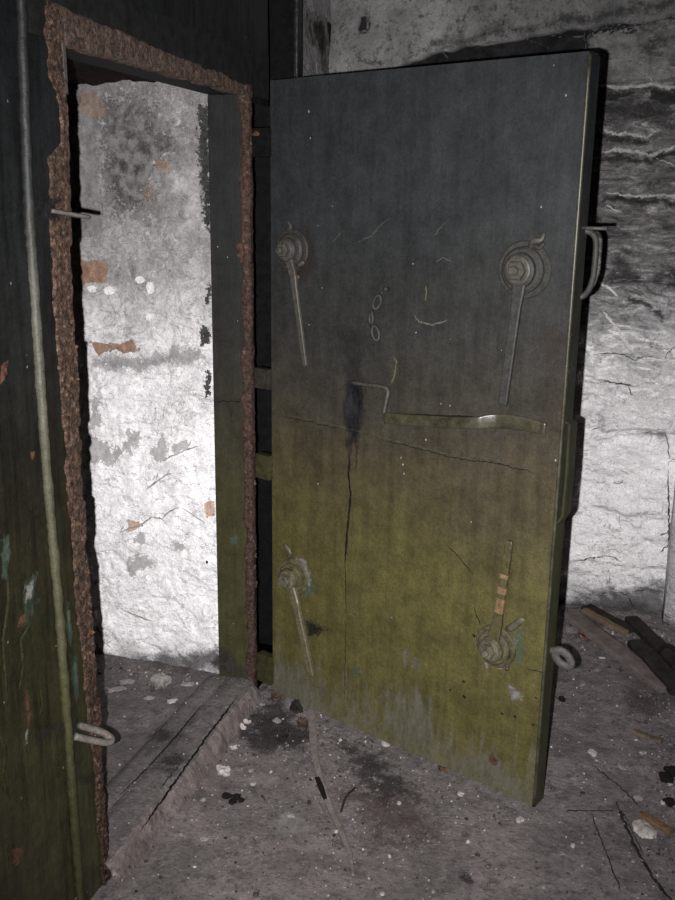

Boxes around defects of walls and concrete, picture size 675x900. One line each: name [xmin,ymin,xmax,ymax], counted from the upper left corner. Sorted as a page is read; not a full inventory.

flaking render [78,259,116,295]
flaking render [89,339,141,356]
crack [596,346,673,361]
crack [602,379,636,401]
crack [281,414,545,475]
crack [344,455,352,700]
crack [564,764,672,900]